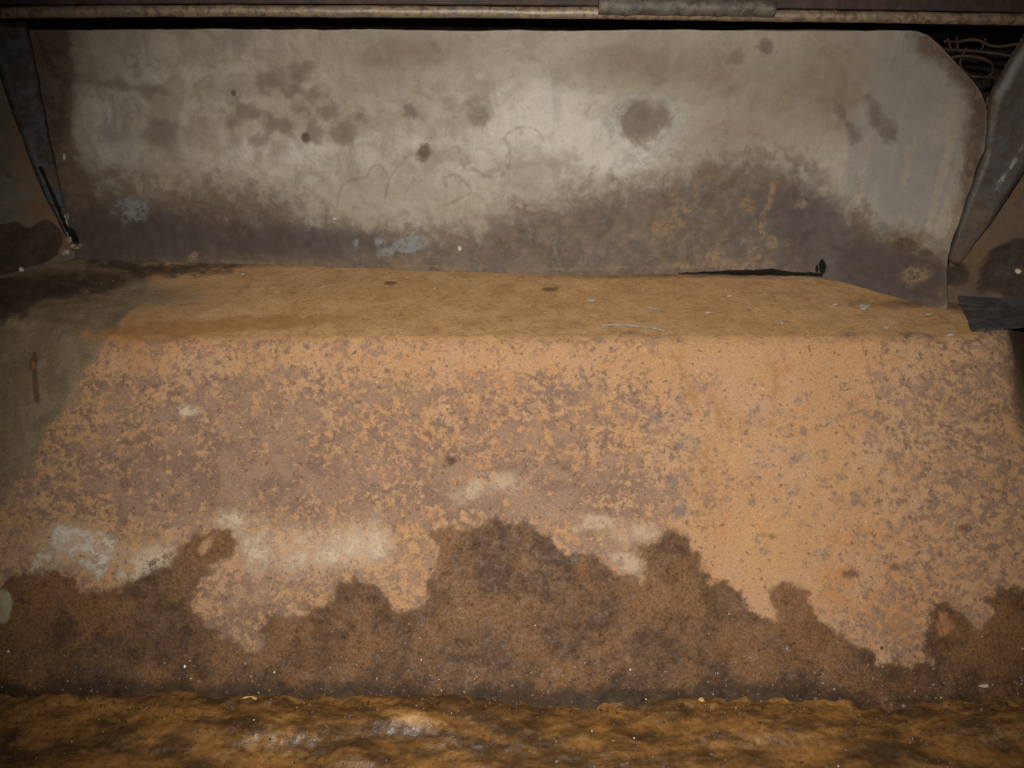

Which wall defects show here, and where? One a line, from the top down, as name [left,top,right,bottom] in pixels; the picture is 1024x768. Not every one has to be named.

water stain [0,220,233,320]
water stain [0,512,1024,710]